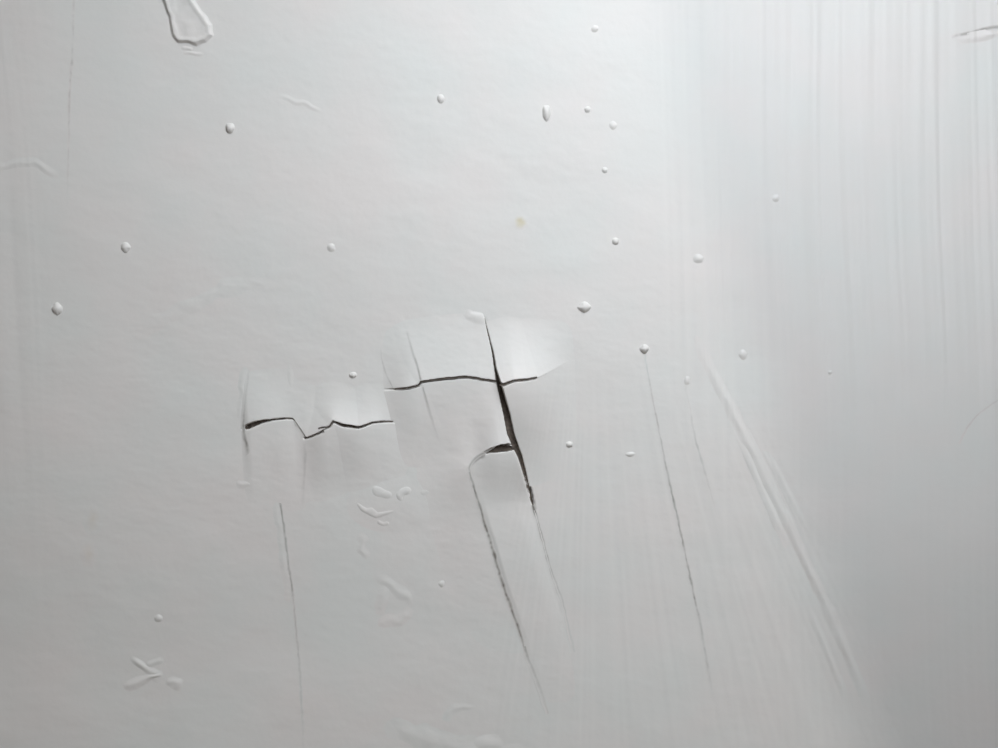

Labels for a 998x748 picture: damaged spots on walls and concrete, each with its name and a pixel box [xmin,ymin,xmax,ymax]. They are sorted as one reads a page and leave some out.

crack [236,309,576,748]